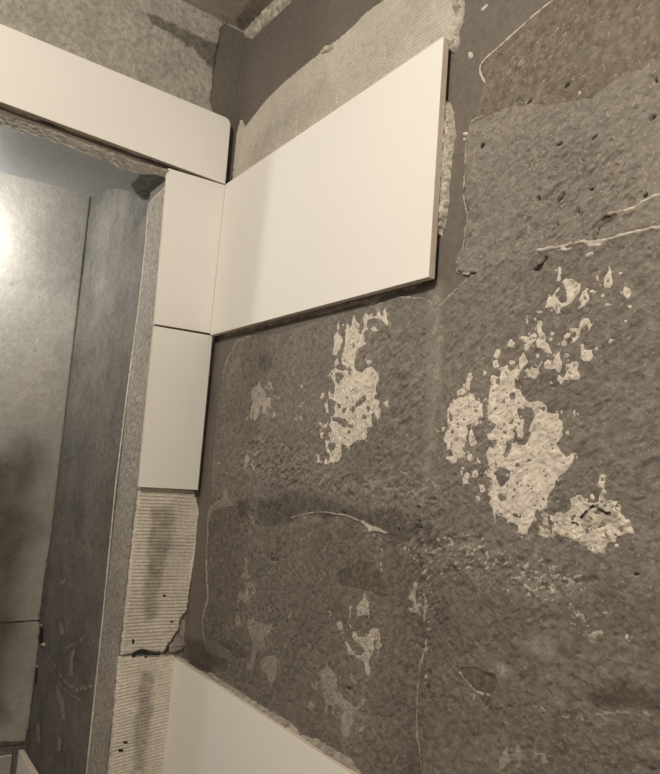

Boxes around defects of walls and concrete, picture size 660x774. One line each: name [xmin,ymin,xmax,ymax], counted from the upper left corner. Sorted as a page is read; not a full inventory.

leakage [150,16,217,65]
peeling [435,267,636,557]
peeling [236,308,608,642]
crack [132,646,170,657]
peeling [218,606,281,687]